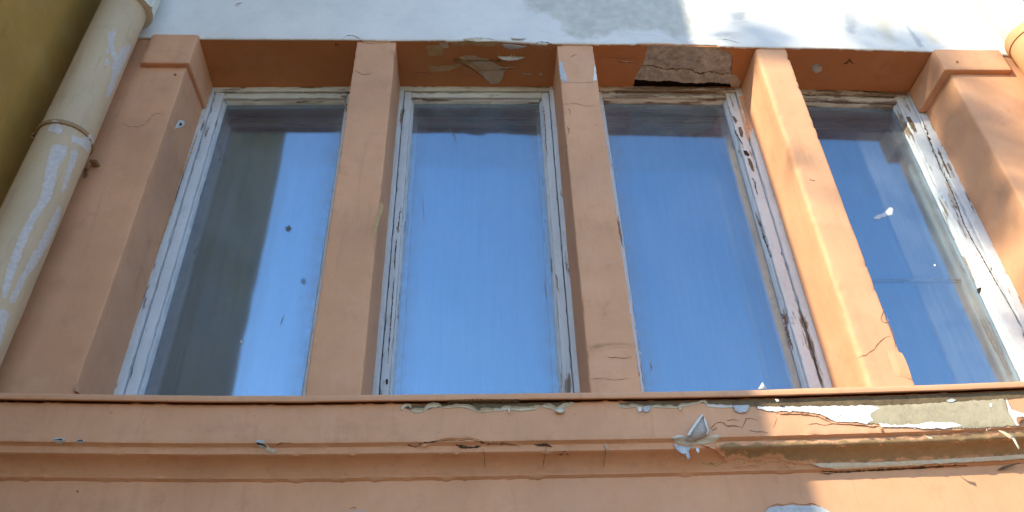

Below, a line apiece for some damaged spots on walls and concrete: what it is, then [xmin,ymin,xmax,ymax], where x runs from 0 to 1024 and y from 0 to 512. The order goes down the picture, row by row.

flaking render [416,0,741,87]
peeling [906,116,1019,323]
crack [853,311,896,359]
peeling [401,399,574,413]
crack [407,431,568,466]
spalling [617,382,1024,474]